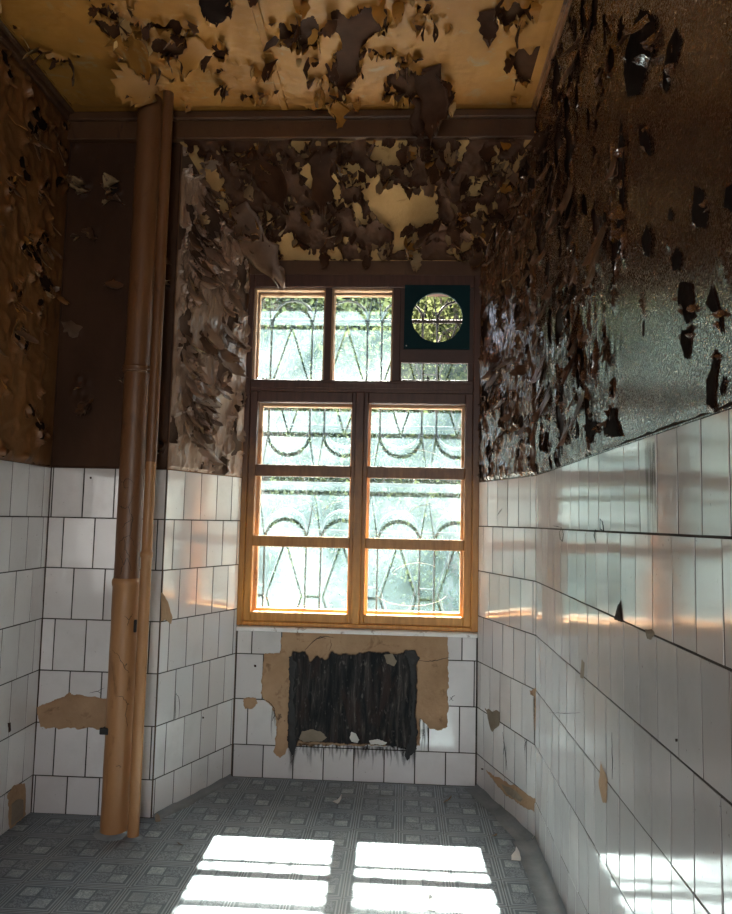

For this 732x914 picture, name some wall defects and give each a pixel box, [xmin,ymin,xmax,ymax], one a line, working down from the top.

peeling [0,0,732,481]
peeling [161,593,173,624]
peeling [37,692,107,730]
peeling [243,632,455,758]
peeling [485,708,500,732]
peeling [7,783,26,829]
peeling [481,768,536,811]
peeling [598,764,608,803]